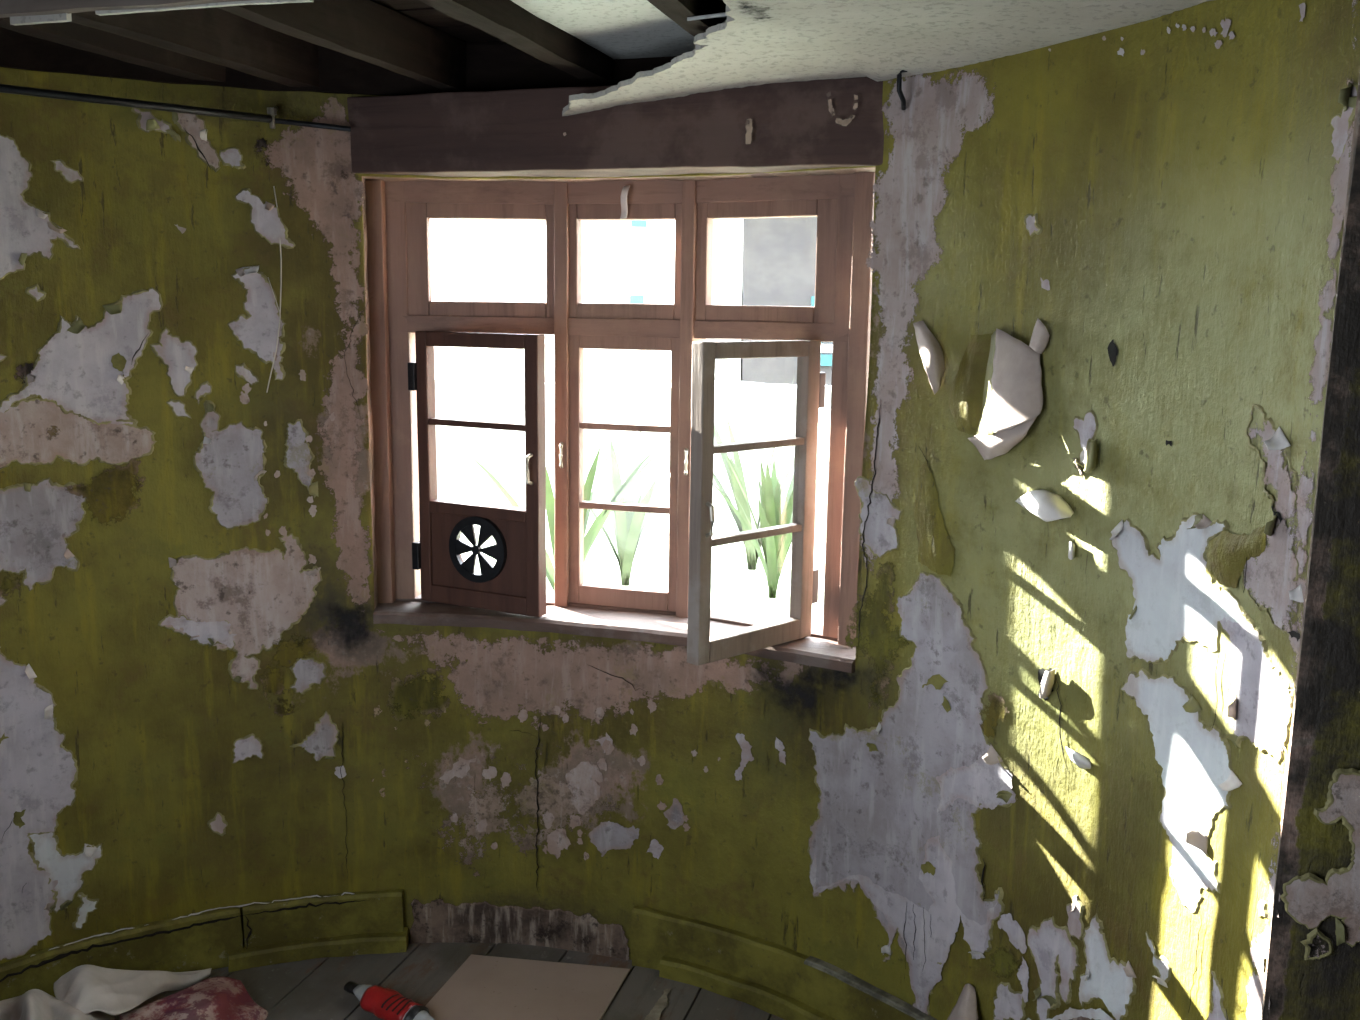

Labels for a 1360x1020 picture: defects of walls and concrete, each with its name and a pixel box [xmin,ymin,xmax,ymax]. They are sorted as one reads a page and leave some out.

flaking render [0,97,372,694]
flaking render [854,68,995,604]
peeling [1110,79,1358,914]
peeling [0,646,149,961]
peeling [207,812,228,836]
peeling [232,733,264,763]
spalling [173,892,354,920]
peeling [290,711,347,778]
flaking render [377,629,810,877]
peeling [807,572,1171,1020]